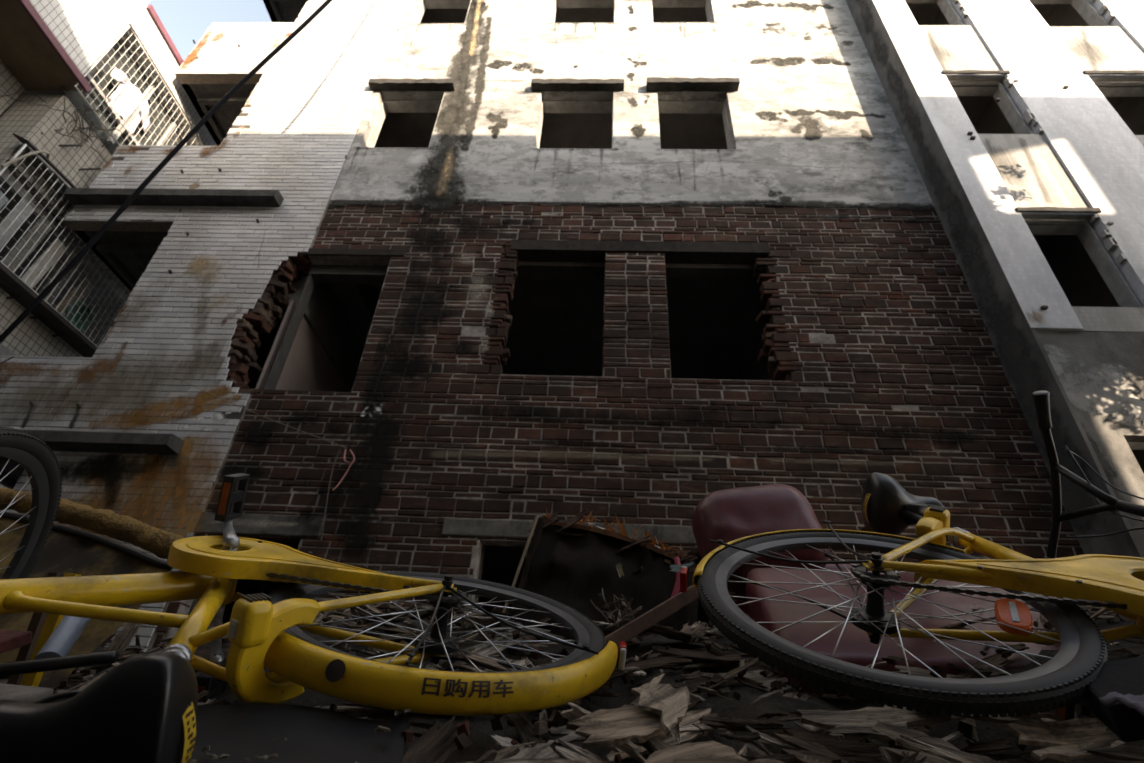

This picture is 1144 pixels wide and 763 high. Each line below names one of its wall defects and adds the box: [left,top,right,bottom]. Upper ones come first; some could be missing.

corrosion [0,342,127,394]
leakage [1,346,225,429]
corrosion [89,386,241,428]
spalling [225,255,312,395]
leakage [298,0,1144,557]
leakage [59,437,264,538]